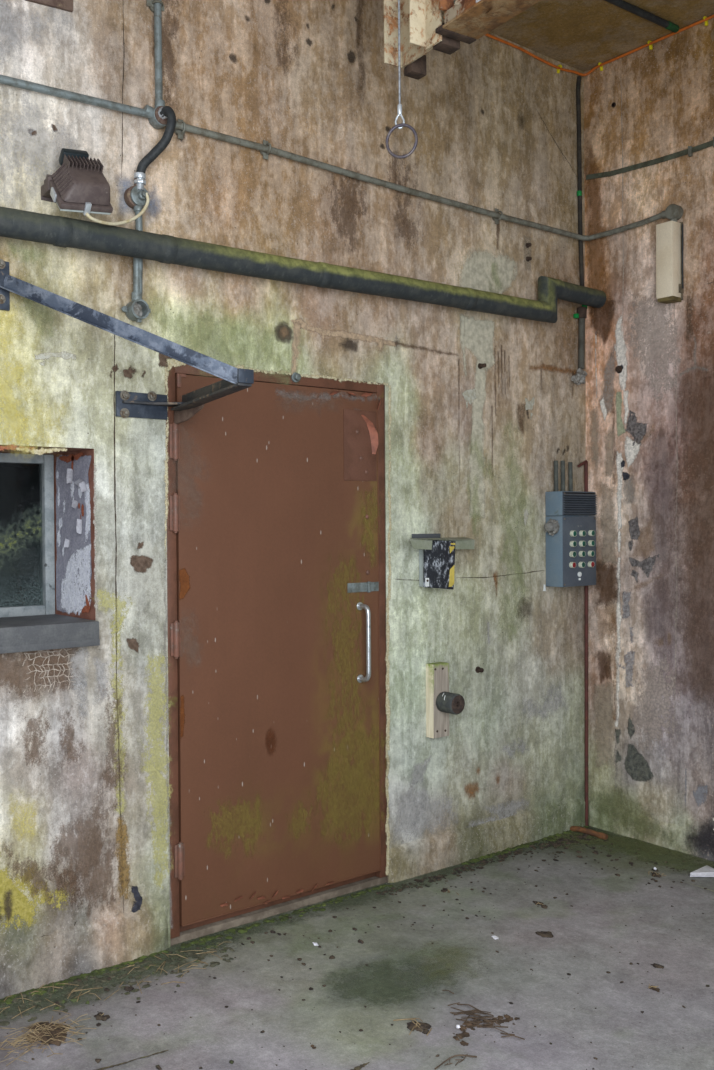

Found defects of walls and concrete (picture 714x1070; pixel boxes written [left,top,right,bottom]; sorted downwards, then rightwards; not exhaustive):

spalling [625,410,648,446]
peeling [0,444,98,615]
spalling [628,516,659,582]
spalling [619,592,635,687]
damp [25,719,48,765]
damp [60,726,81,764]
damp [102,695,122,788]
spalling [615,717,654,782]
damp [6,804,117,916]
damp [687,825,714,853]